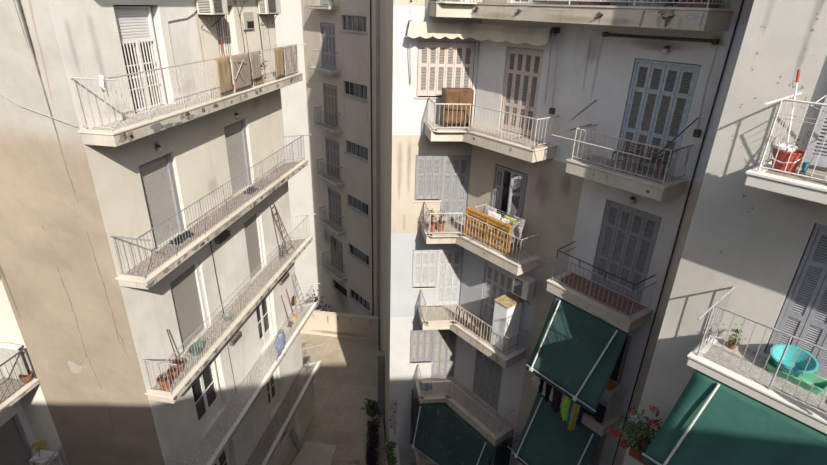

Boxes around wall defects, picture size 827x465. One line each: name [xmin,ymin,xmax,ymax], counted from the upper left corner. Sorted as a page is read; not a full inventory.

peeling [150,104,219,133]
spalling [119,131,134,143]